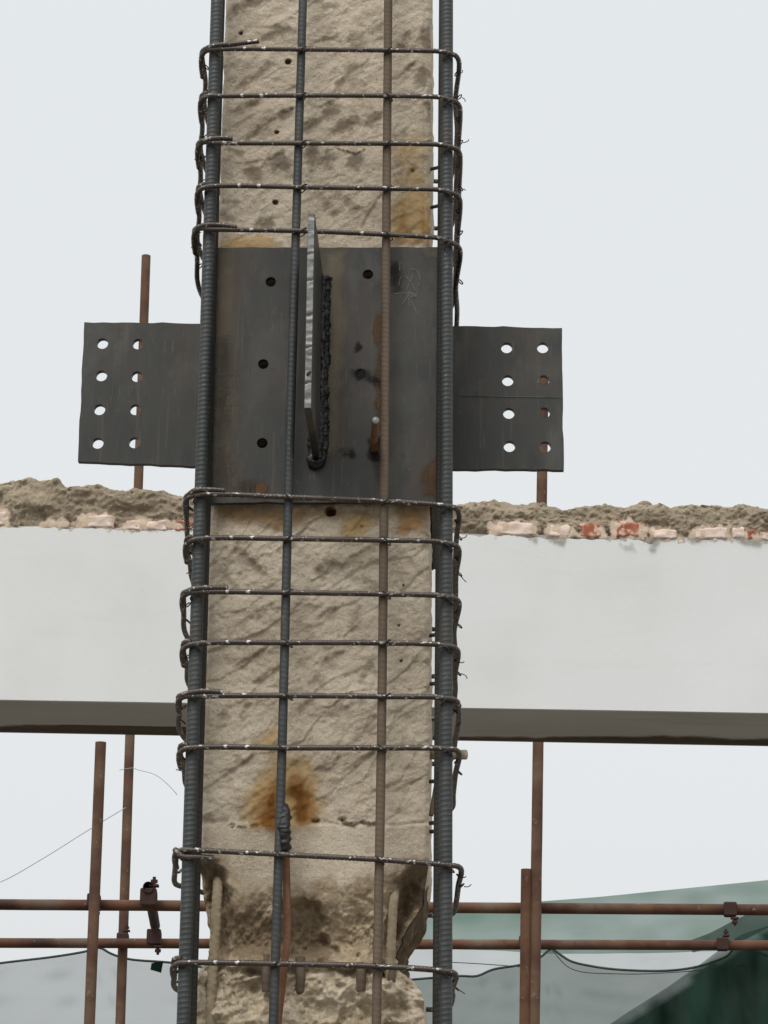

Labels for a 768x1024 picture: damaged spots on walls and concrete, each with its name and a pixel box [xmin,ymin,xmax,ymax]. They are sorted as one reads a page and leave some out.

rust [393,193,431,240]
flaking render [0,507,11,527]
spalling [39,0,453,1024]
flaking render [486,516,768,543]
rust [247,762,319,826]